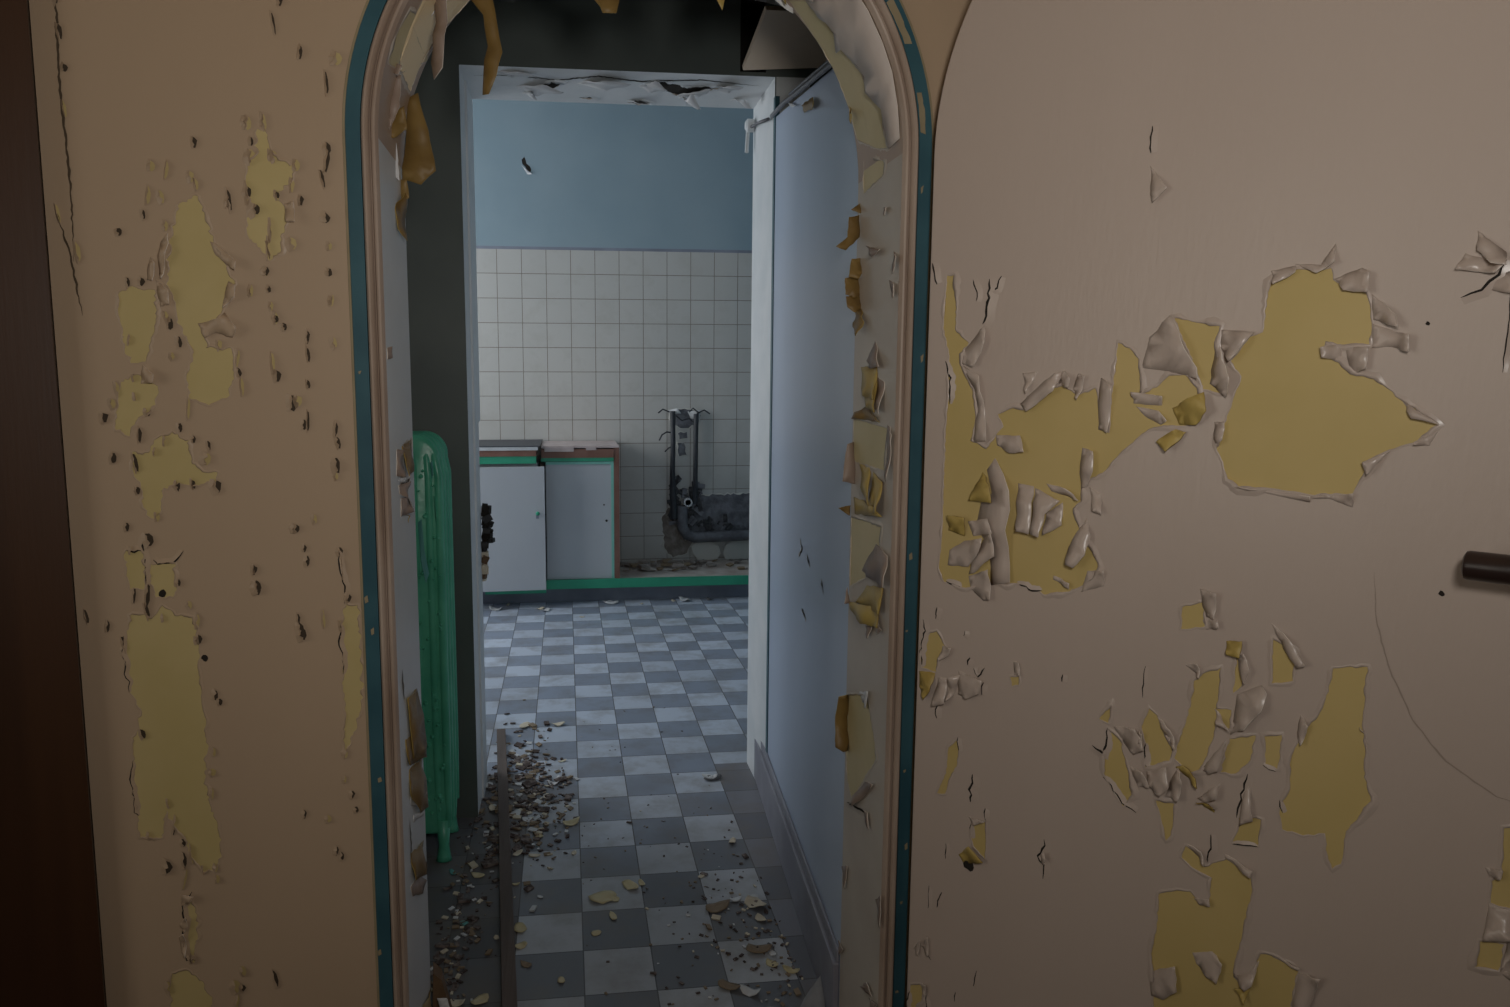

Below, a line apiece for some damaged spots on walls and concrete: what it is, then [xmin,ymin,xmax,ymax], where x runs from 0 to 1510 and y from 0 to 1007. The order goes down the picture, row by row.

peeling [387,0,757,241]
peeling [775,0,900,336]
peeling [98,111,304,608]
peeling [396,437,414,523]
peeling [668,408,701,457]
peeling [661,492,750,558]
peeling [839,341,892,639]
peeling [932,244,1445,601]
peeling [835,691,878,830]
peeling [905,608,989,719]
peeling [1089,589,1380,1007]
peeling [1467,824,1510,980]